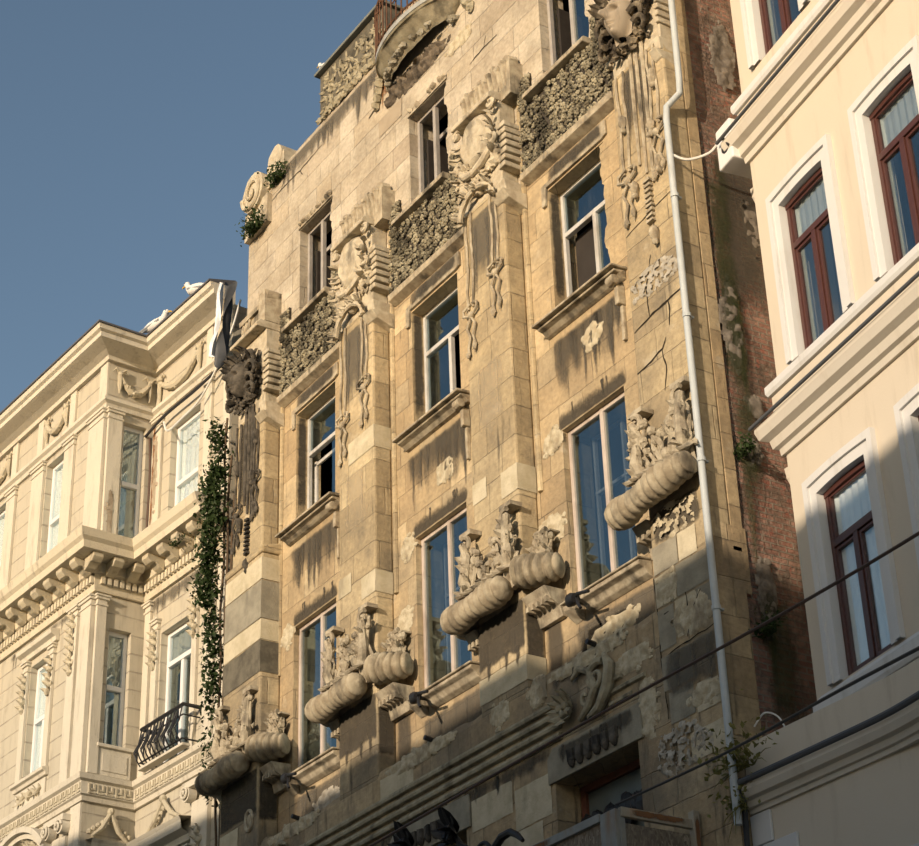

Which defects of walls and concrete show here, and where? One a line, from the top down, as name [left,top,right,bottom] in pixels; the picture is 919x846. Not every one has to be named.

spalling [384,22,472,109]
leakage [709,155,766,393]
leakage [554,297,620,382]
crack [635,254,680,387]
leakage [292,520,339,585]
leakage [410,416,471,538]
spalling [647,493,698,539]
leakage [294,581,337,626]
spalling [525,603,721,778]
spalling [384,730,457,776]